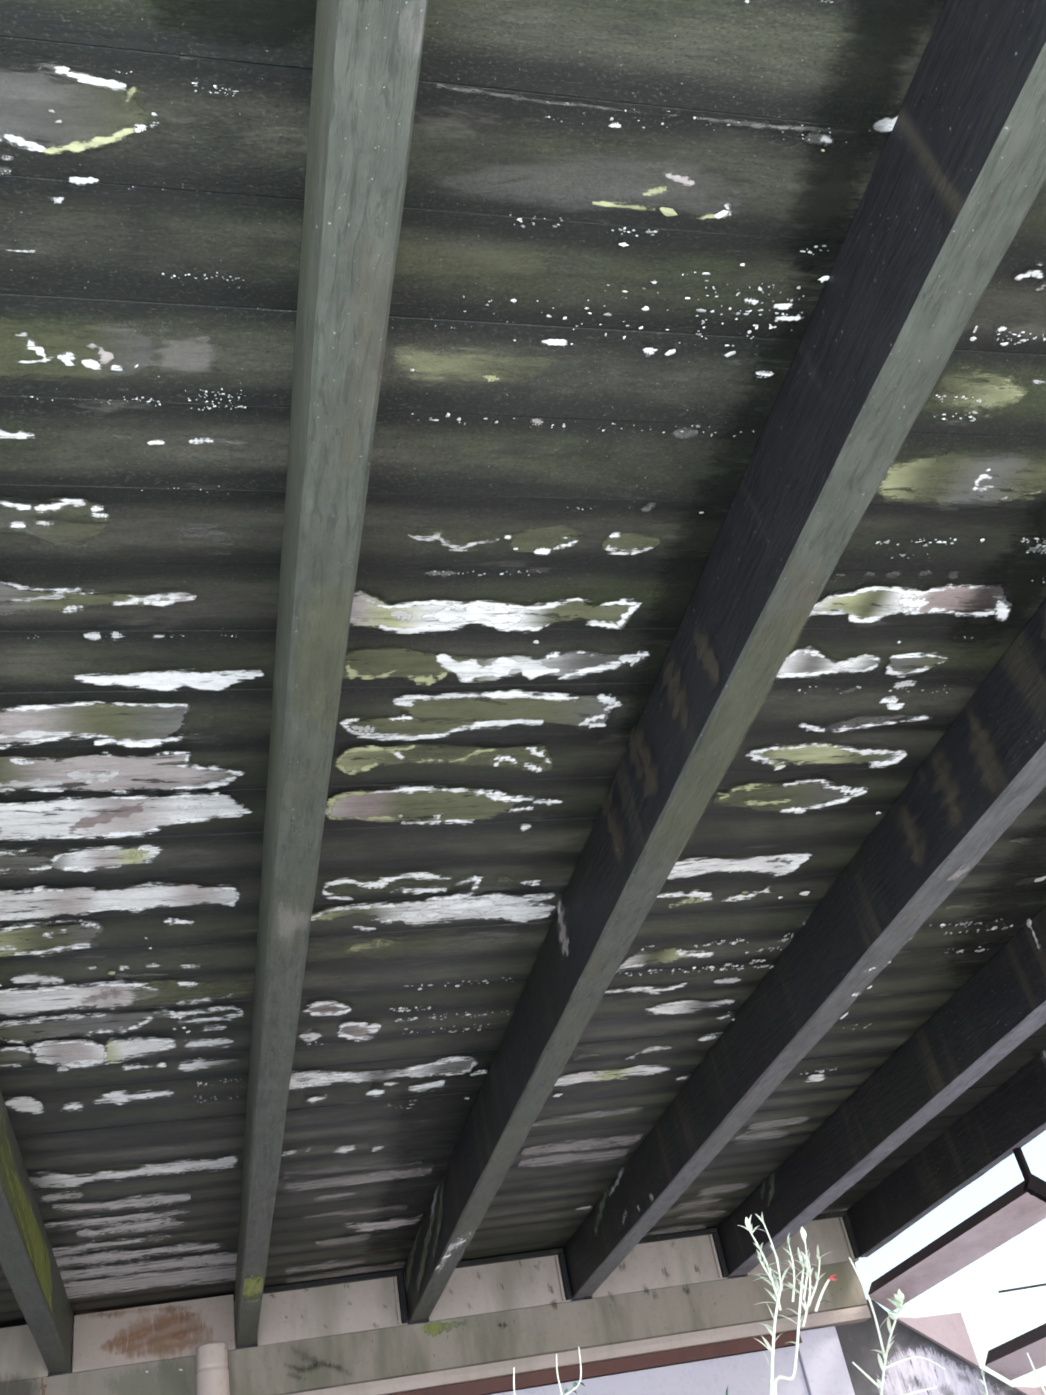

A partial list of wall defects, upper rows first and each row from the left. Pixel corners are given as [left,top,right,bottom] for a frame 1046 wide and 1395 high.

damp [152,0,317,46]
damp [626,0,943,734]
peeling [810,584,1010,623]
damp [954,502,1046,645]
peeling [335,591,649,775]
peeling [715,641,951,814]
peeling [0,670,264,957]
peeling [311,872,556,931]
peeling [325,786,563,831]
peeling [657,854,811,907]
peeling [0,937,254,1103]
peeling [29,1156,238,1300]